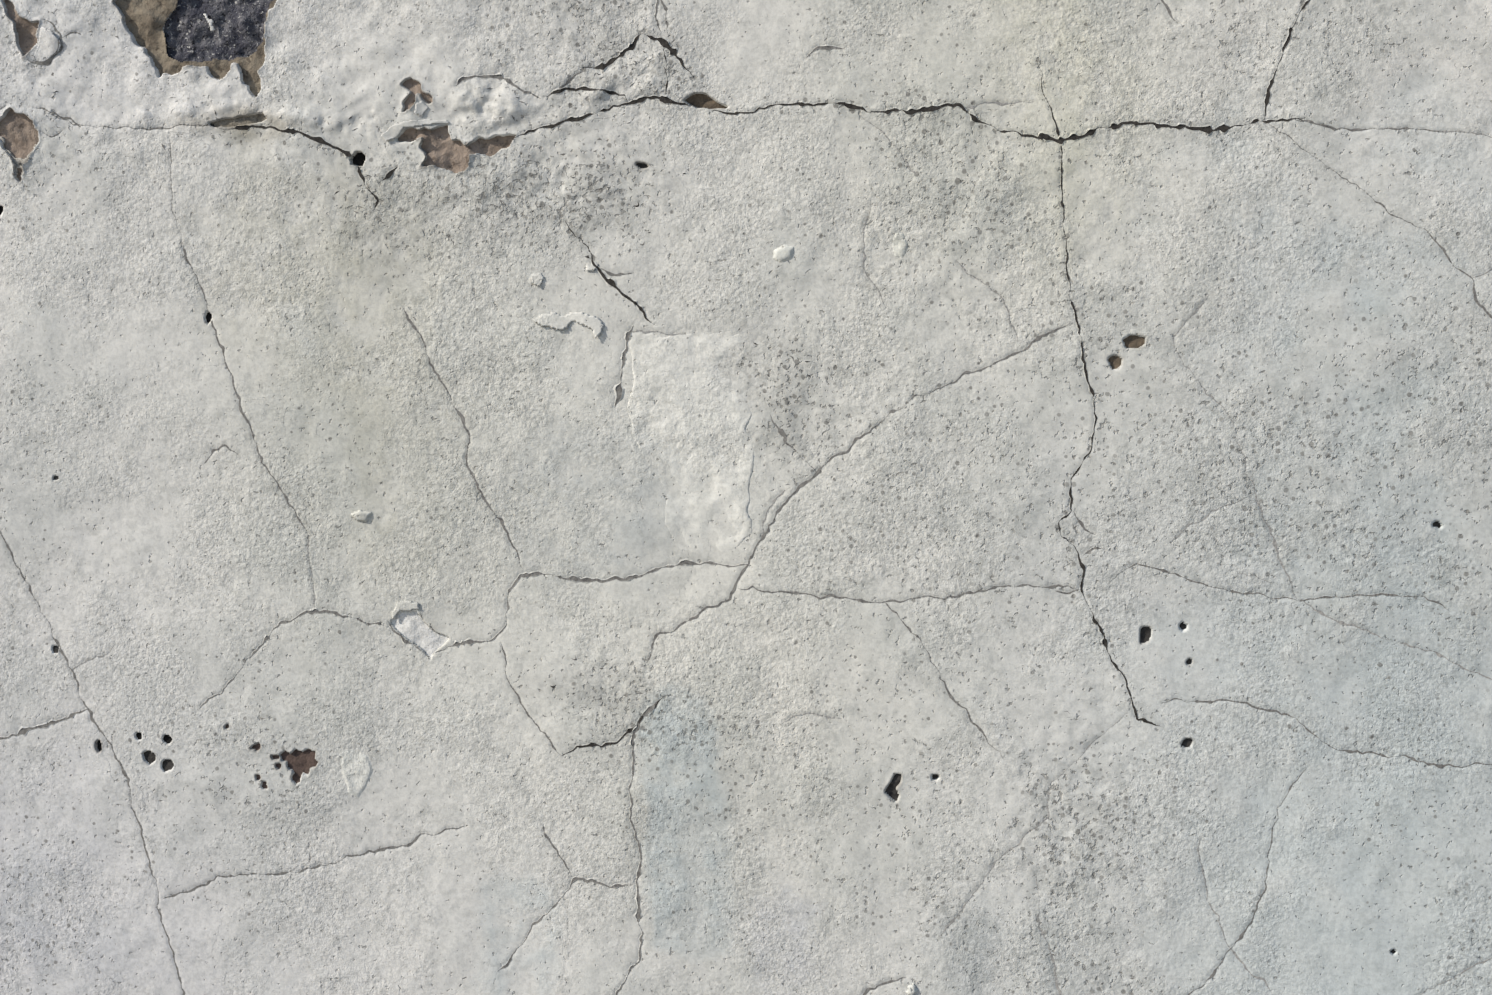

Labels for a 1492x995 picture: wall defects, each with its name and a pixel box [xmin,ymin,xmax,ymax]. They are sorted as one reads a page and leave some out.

peeling [3,0,61,69]
crack [28,19,81,66]
peeling [115,0,277,127]
peeling [0,98,39,191]
crack [41,107,398,224]
peeling [381,79,515,173]
crack [183,0,1492,754]
crack [0,531,463,995]
crack [497,645,664,995]
crack [1164,698,1492,769]
crack [1188,769,1306,995]
crack [863,977,905,995]